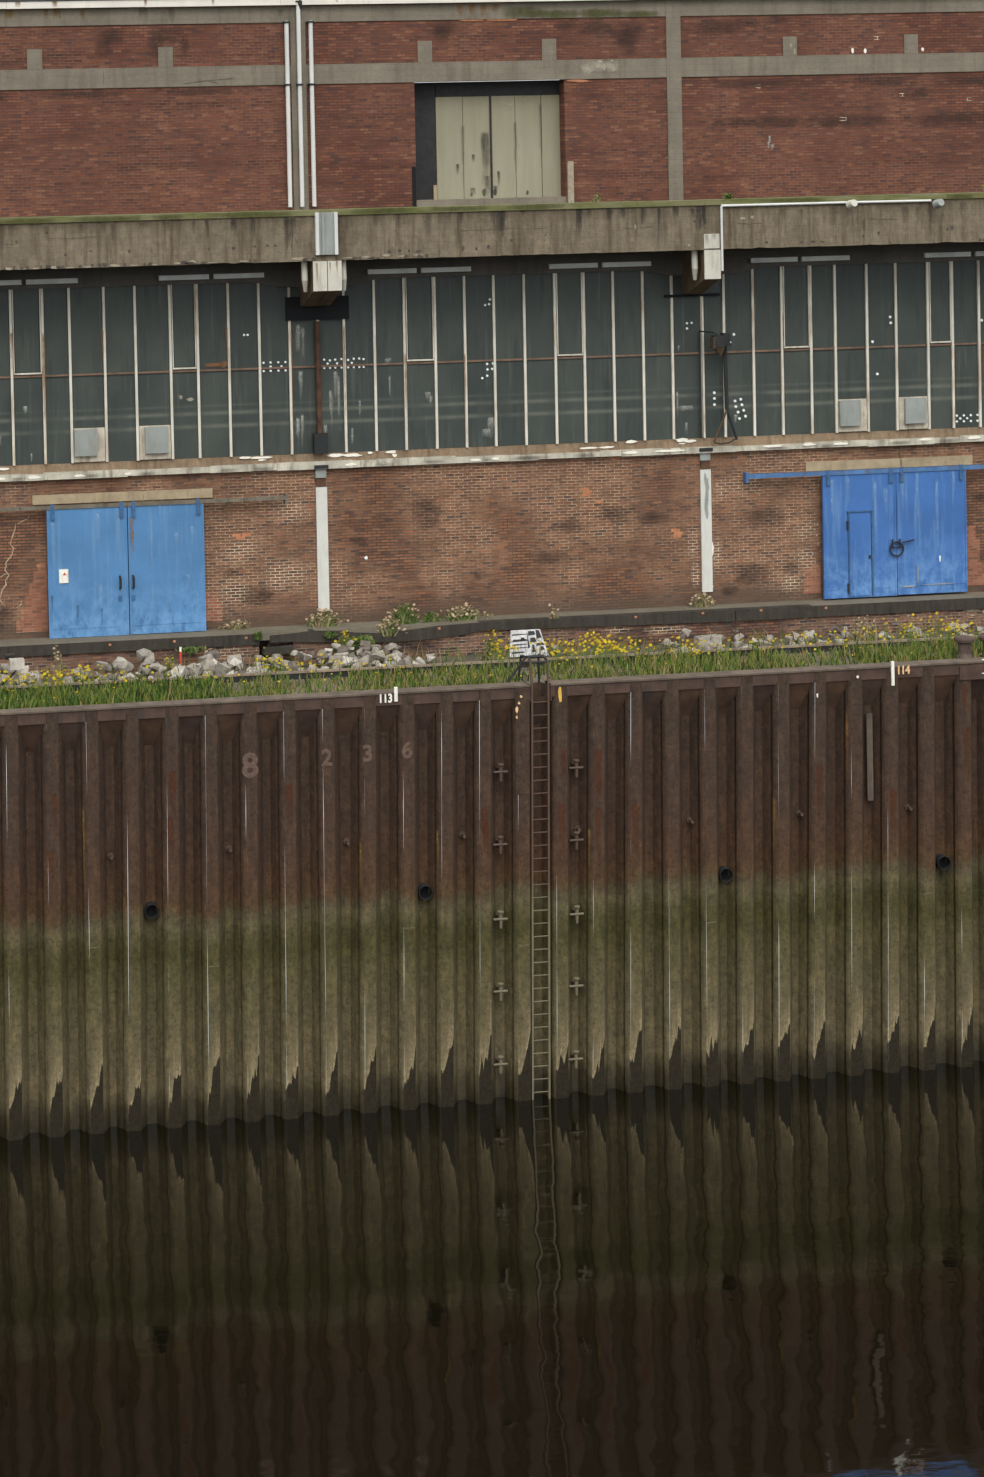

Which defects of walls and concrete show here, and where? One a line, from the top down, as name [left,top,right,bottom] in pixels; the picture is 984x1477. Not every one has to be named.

crack [0,514,30,609]
water stain [50,1065,63,1138]
water stain [169,1060,182,1128]
water stain [208,1045,221,1125]
water stain [325,1041,338,1116]
water stain [441,1021,454,1108]
water stain [518,1021,531,1102]
water stain [630,1014,642,1093]
water stain [669,1012,681,1090]
water stain [813,1006,825,1079]
water stain [924,1007,936,1070]
water stain [961,999,973,1068]